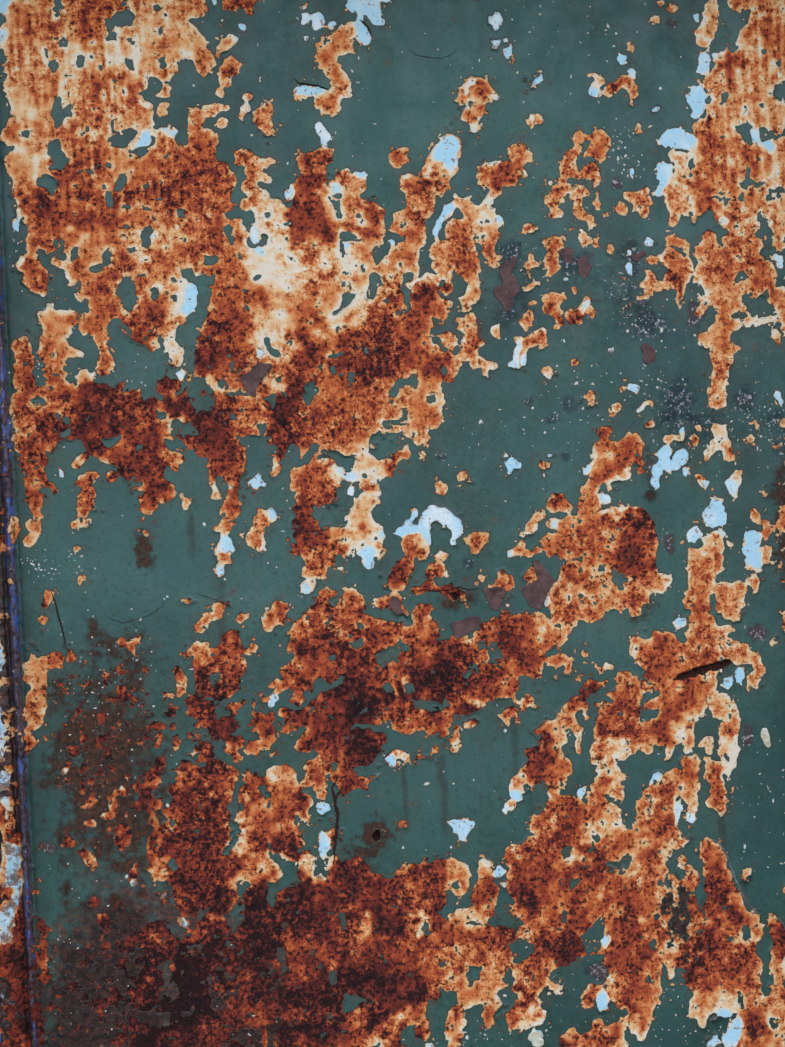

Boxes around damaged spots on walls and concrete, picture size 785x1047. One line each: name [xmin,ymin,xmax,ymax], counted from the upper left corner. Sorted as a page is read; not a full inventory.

corrosion [0,0,538,598]
corrosion [508,0,785,502]
peeling [650,427,690,490]